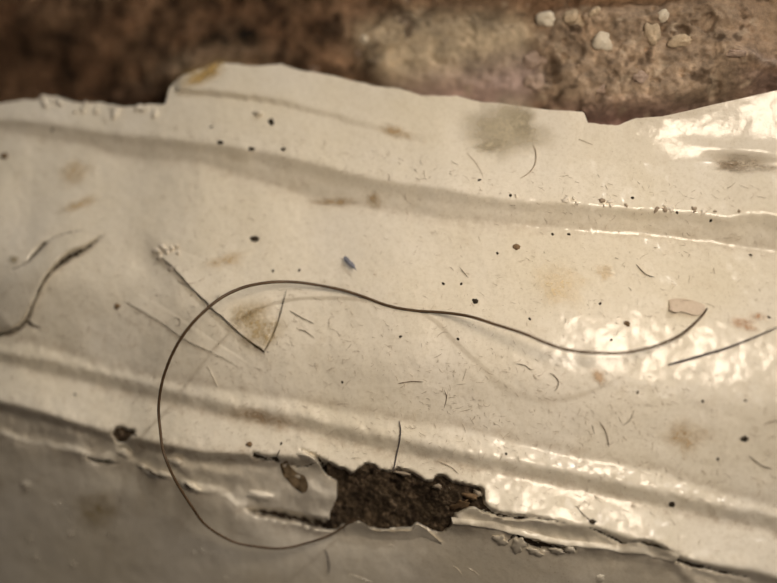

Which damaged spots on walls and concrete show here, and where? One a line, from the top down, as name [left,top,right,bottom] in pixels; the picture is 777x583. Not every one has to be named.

flaking render [0,0,777,159]
crack [0,230,102,336]
peeling [0,427,680,563]